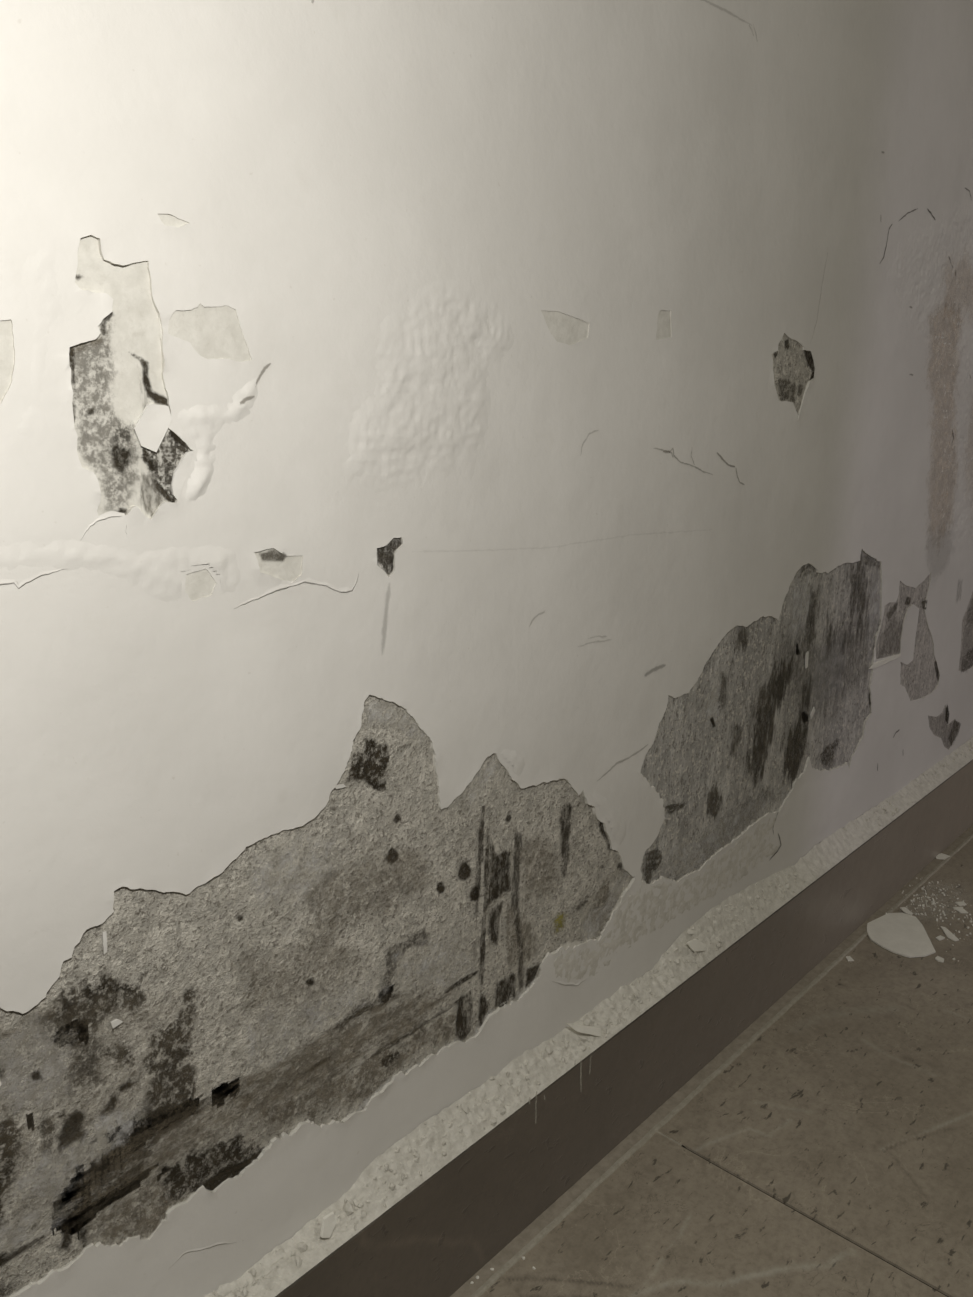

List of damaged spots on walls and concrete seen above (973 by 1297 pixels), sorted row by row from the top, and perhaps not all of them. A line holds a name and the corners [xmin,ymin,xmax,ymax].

peeling [0,320,14,403]
peeling [69,235,251,540]
peeling [772,334,815,415]
peeling [377,538,402,576]
peeling [958,592,973,672]
peeling [928,705,960,749]
peeling [0,548,940,1297]